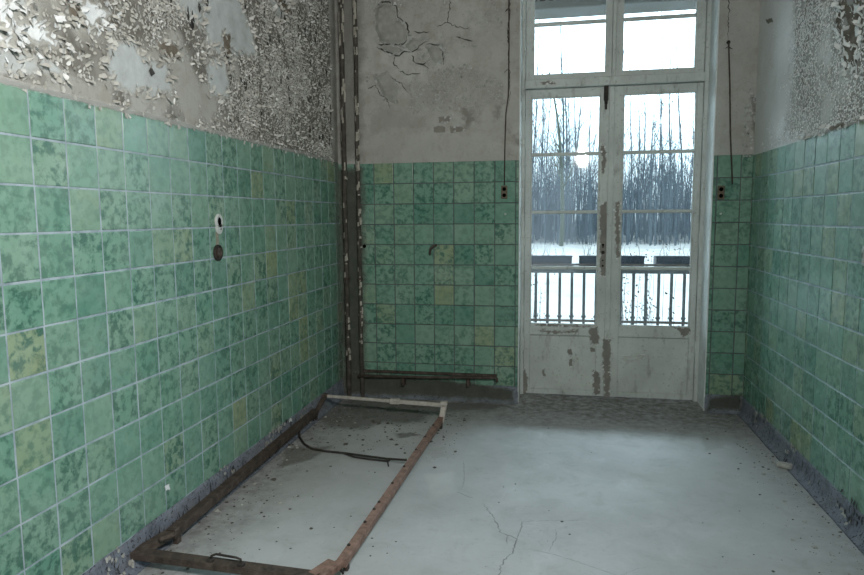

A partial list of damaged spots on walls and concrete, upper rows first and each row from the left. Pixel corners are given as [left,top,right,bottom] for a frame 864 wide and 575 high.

flaking render [0,0,360,195]
crack [368,1,471,109]
peeling [762,0,864,148]
crack [458,463,524,575]